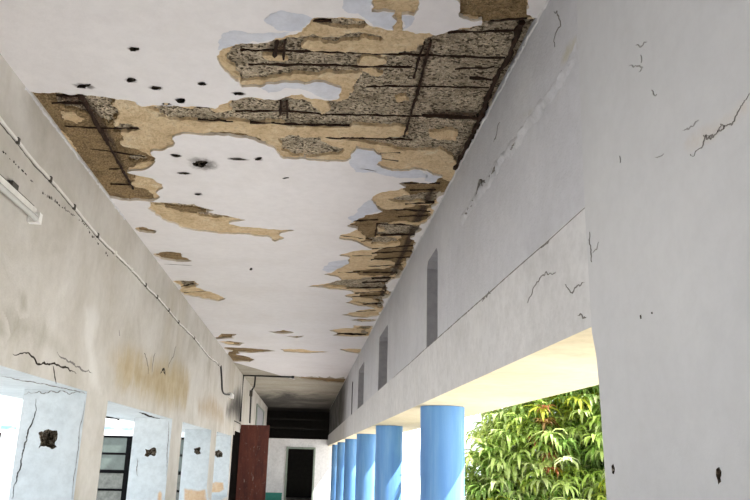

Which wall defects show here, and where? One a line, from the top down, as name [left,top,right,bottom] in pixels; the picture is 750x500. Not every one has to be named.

corrosion [60,97,121,162]
spalling [25,0,550,337]
crack [684,93,750,157]
crack [393,208,585,378]
crack [3,352,91,494]
spalling [39,429,58,449]
leakage [97,321,227,433]